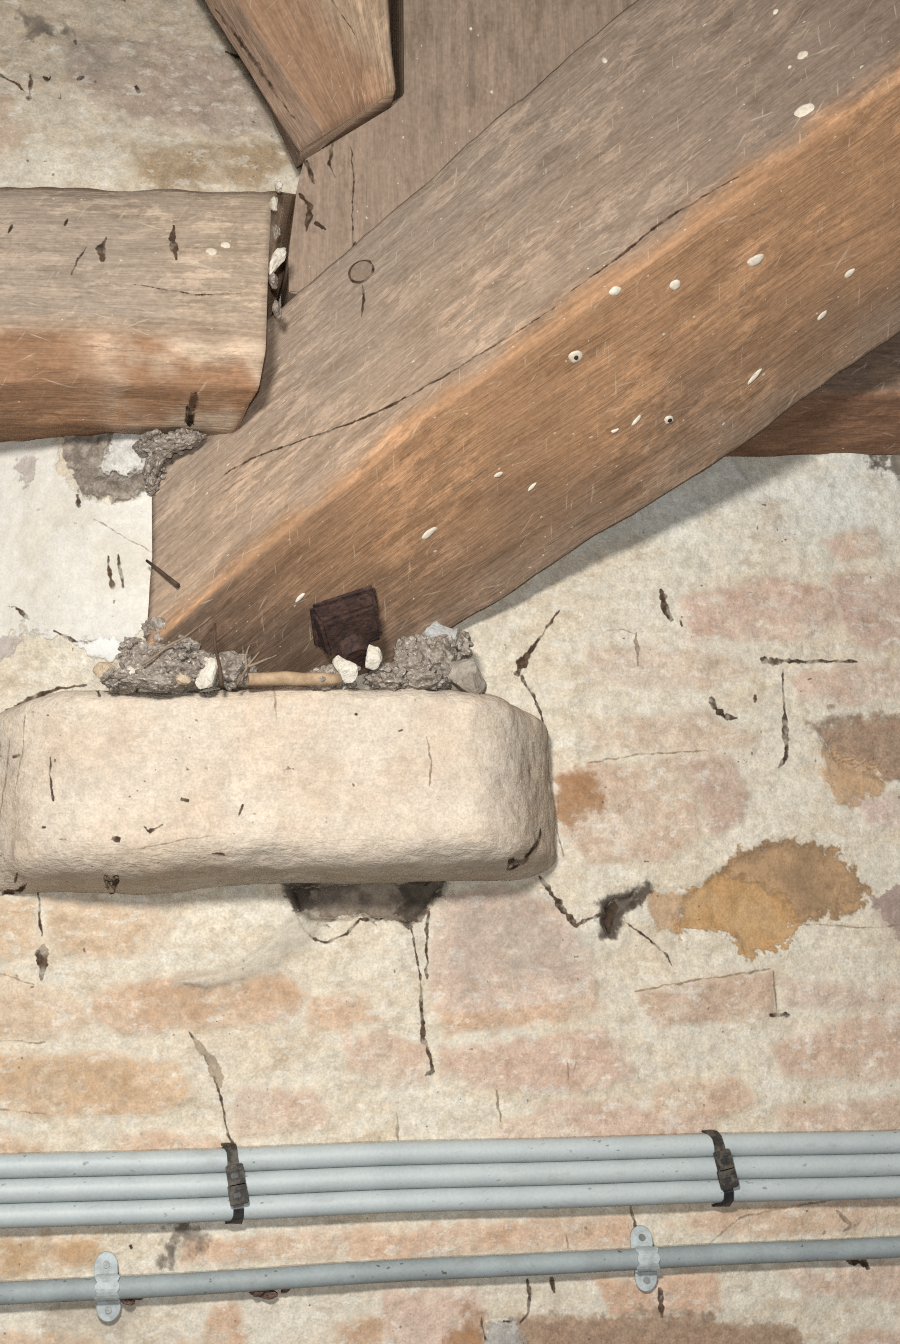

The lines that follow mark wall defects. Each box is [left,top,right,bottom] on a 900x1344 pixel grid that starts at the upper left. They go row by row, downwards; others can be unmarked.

crack [1,75,32,99]
peeling [0,433,152,662]
crack [659,589,683,626]
crack [514,610,560,722]
crack [709,656,857,768]
crack [507,828,777,1007]
crack [297,877,435,1075]
crack [189,1032,237,1146]